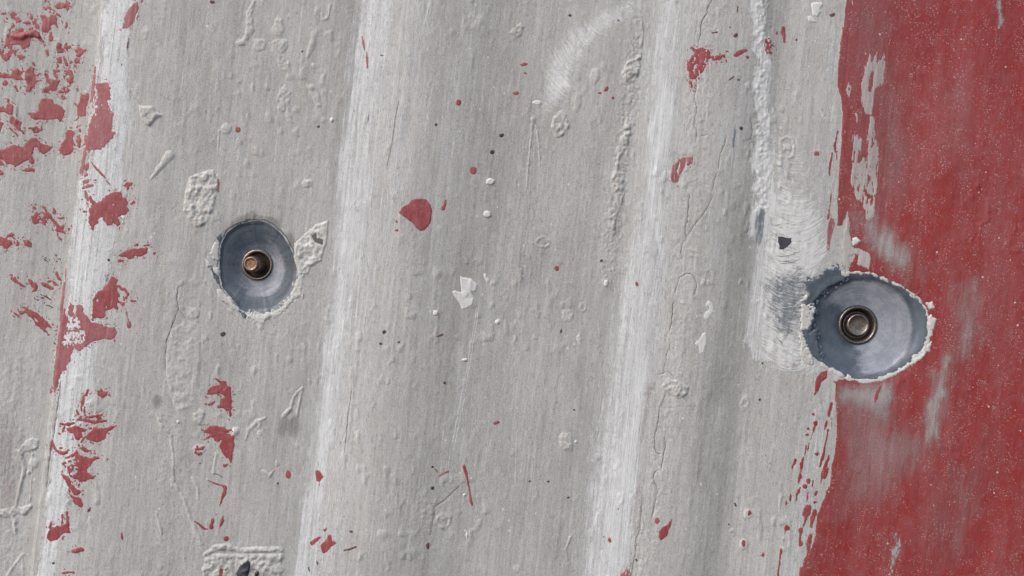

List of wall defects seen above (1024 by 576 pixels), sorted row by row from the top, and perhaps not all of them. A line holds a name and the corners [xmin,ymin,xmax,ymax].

peeling [0,0,72,34]
peeling [808,2,823,23]
peeling [72,121,91,179]
peeling [846,52,885,220]
spalling [798,217,937,384]